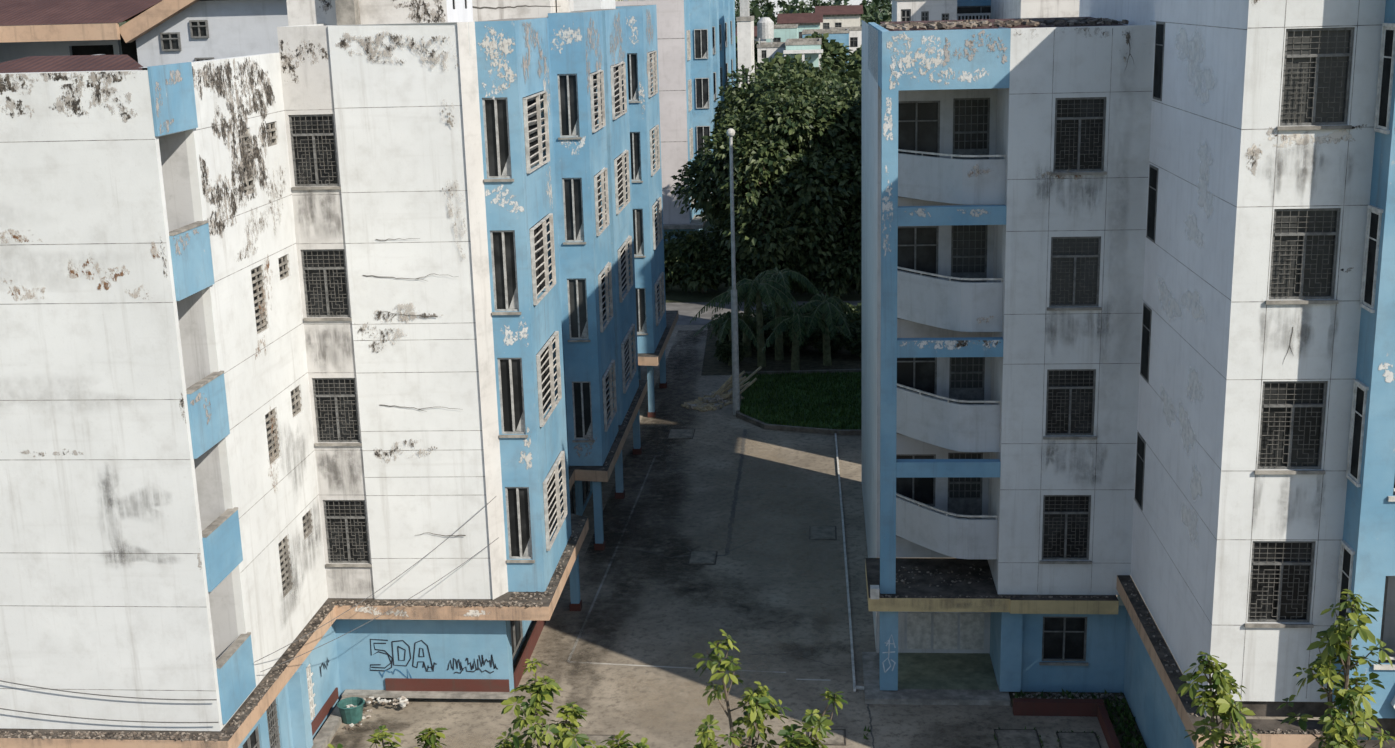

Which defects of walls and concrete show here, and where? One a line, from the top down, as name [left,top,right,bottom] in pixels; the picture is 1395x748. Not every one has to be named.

mould [0,71,137,123]
mould [192,0,458,262]
peeling [478,10,653,119]
peeling [883,30,1007,141]
leakage [1245,127,1277,175]
peeling [882,166,931,256]
crack [363,273,453,281]
crack [384,311,438,321]